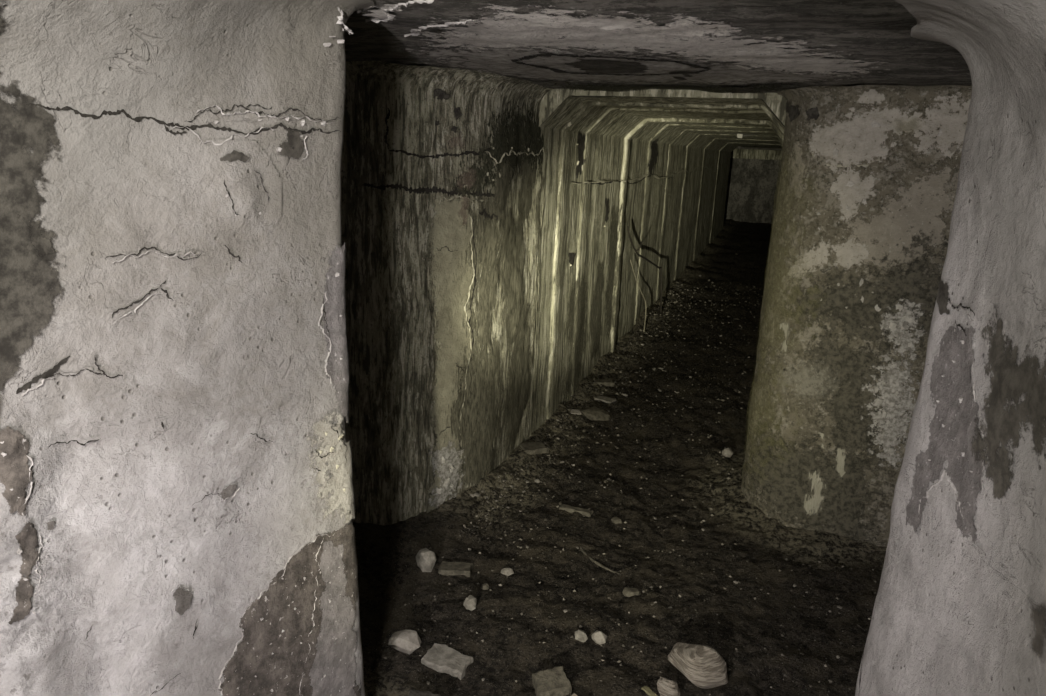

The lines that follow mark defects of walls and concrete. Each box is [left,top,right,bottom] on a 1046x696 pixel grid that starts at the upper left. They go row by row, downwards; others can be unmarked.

flaking render [0,426,55,625]
water stain [0,72,66,403]
crack [16,356,123,396]
crack [105,245,242,319]
crack [31,103,341,146]
spalling [218,242,361,696]
crack [362,108,544,204]
peeling [405,4,971,286]
water stain [743,230,949,545]
flaking render [906,279,985,542]
water stain [971,306,1046,499]
water stain [1031,604,1046,657]